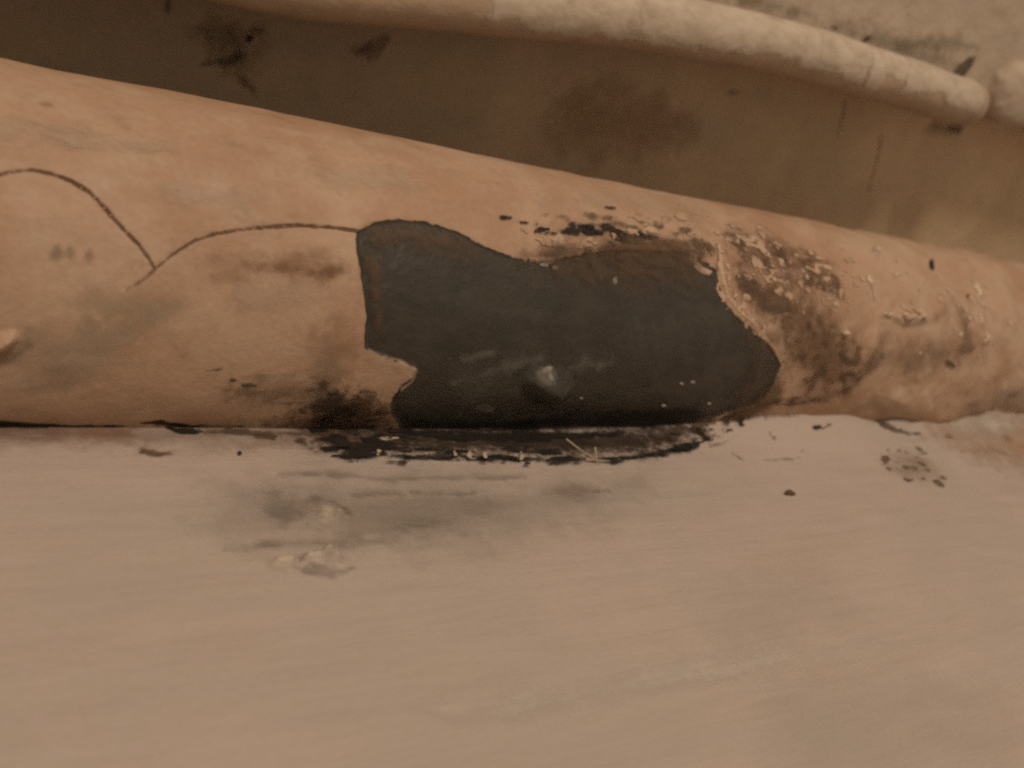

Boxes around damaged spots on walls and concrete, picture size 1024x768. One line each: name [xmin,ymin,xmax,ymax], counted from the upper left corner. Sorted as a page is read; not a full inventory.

crack [0,168,358,268]
spalling [356,203,876,431]
leakage [141,379,801,465]